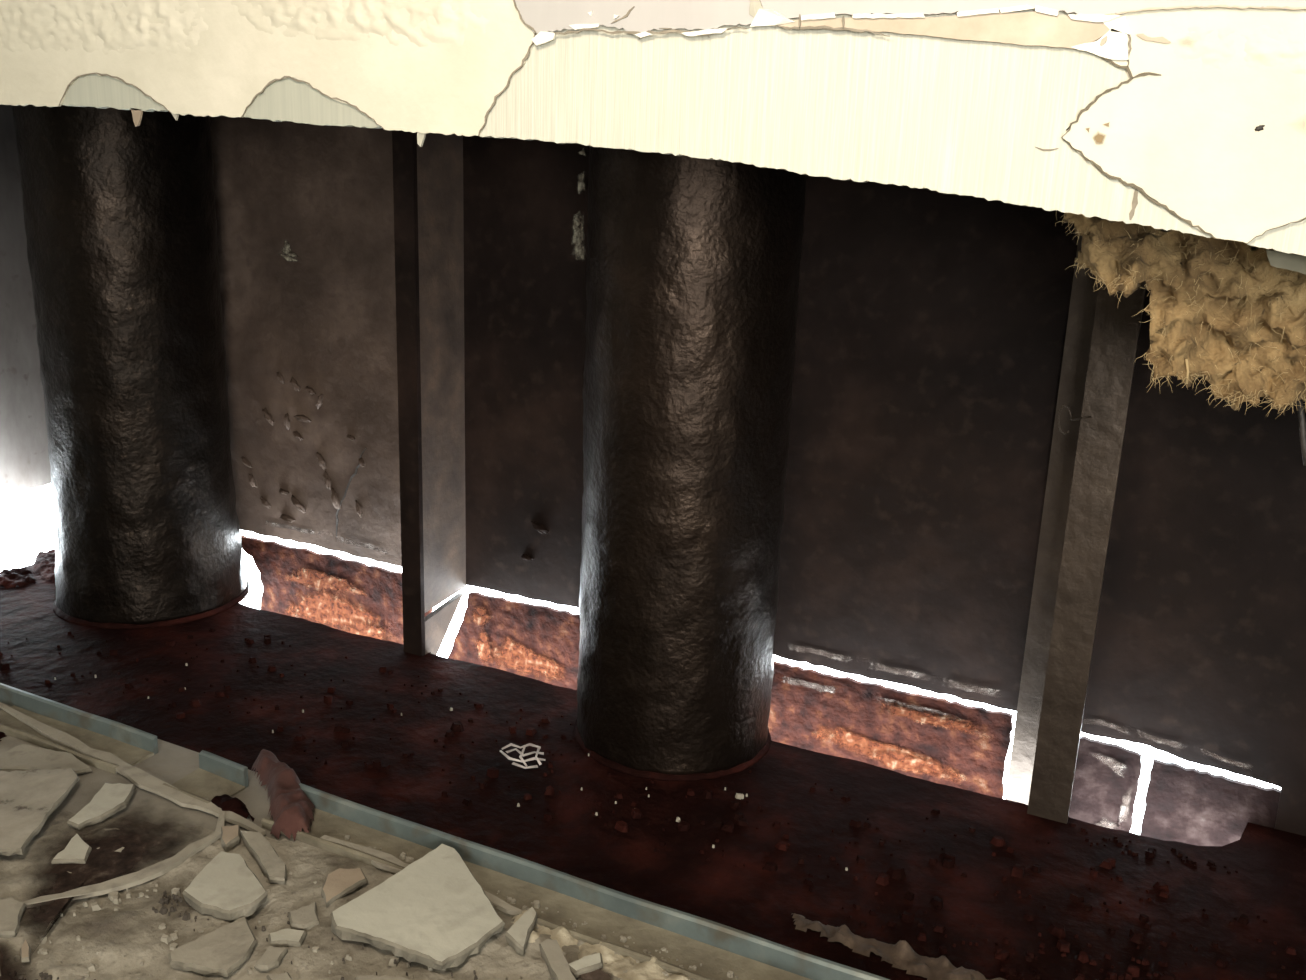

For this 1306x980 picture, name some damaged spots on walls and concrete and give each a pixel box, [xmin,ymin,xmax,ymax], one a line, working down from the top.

peeling [569,11,599,30]
peeling [682,28,728,36]
peeling [749,0,795,27]
peeling [0,0,537,137]
crack [1036,34,1306,244]
rust [281,567,387,640]
rust [472,607,564,681]
rust [880,700,982,738]
rust [812,727,965,782]